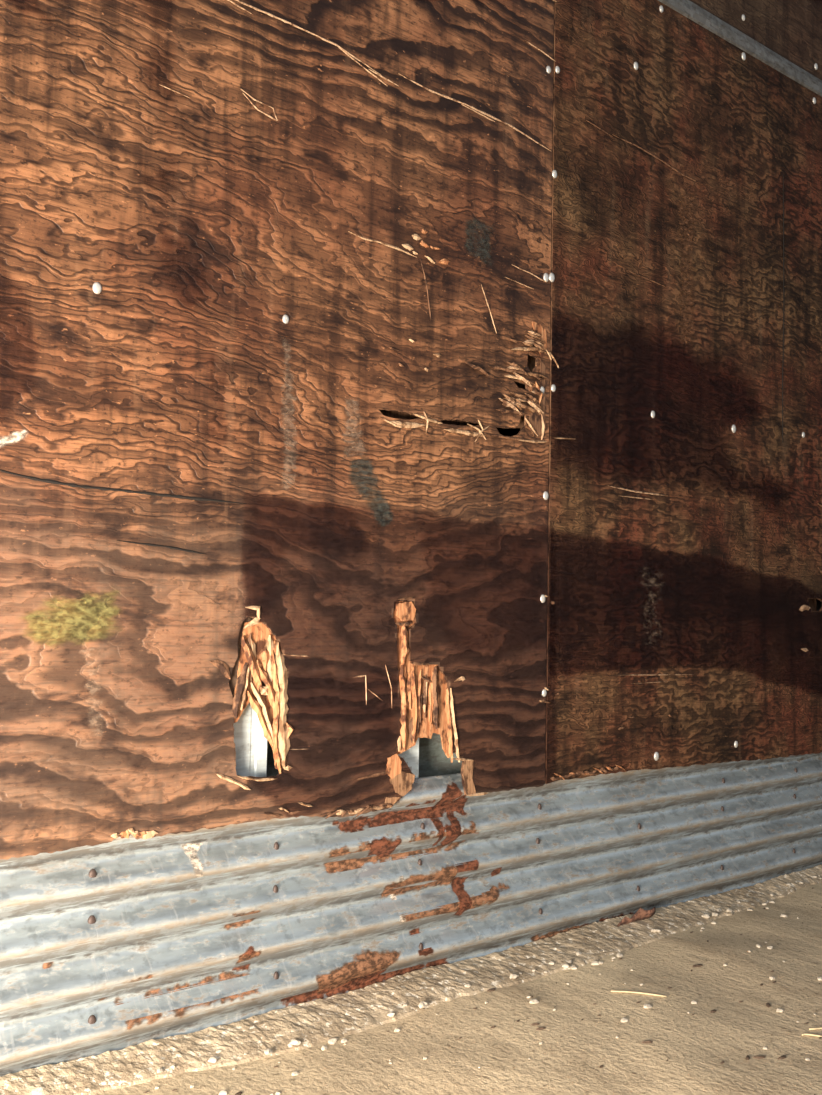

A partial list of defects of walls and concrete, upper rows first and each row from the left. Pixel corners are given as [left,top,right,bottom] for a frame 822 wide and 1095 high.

crack [379,410,574,443]
crack [0,469,245,504]
crack [117,540,204,554]
spalling [210,606,294,790]
hole [356,597,488,808]
rust [324,783,478,873]
rust [381,860,509,936]
rust [281,947,449,1005]